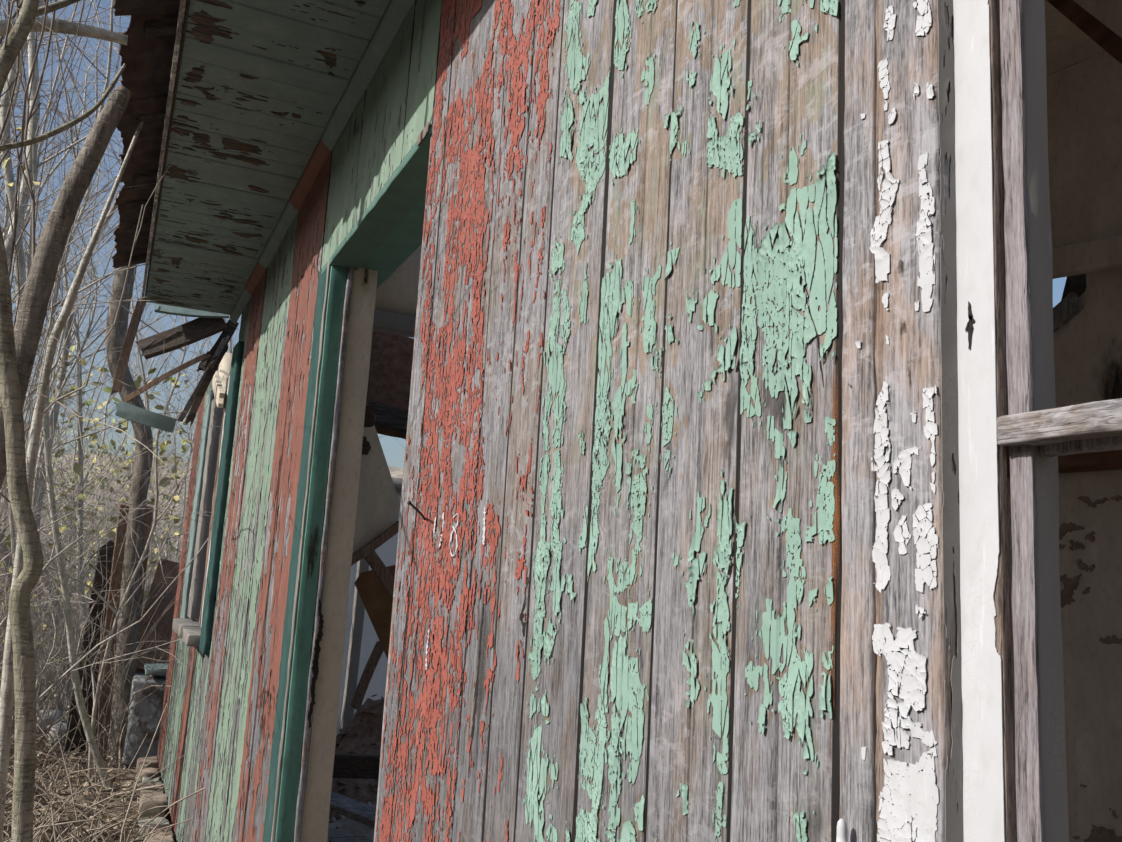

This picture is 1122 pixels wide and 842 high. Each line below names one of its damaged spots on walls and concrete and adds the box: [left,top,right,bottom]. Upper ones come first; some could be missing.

peeling [778,0,838,66]
peeling [664,105,690,161]
peeling [147,0,682,842]
peeling [686,21,838,775]
peeling [869,0,1005,842]
peeling [1059,522,1096,608]
crack [308,599,324,728]
peeling [673,470,748,842]
peeling [785,809,815,842]
peeling [1073,808,1122,842]